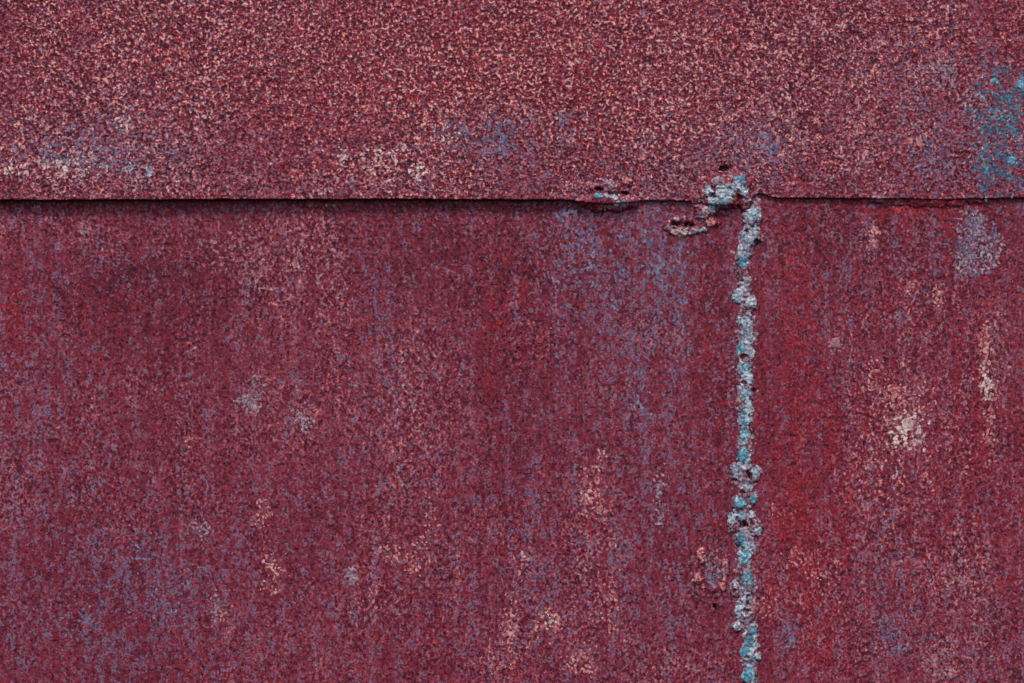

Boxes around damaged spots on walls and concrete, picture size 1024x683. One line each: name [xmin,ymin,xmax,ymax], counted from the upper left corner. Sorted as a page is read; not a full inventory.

corrosion [575,178,639,213]
corrosion [663,214,723,237]
corrosion [861,202,978,222]
corrosion [977,286,1021,466]
peeling [691,173,762,683]
corrosion [759,201,886,683]
corrosion [254,497,273,529]
corrosion [575,448,617,550]
corrosion [254,541,290,596]
corrosion [692,546,730,610]